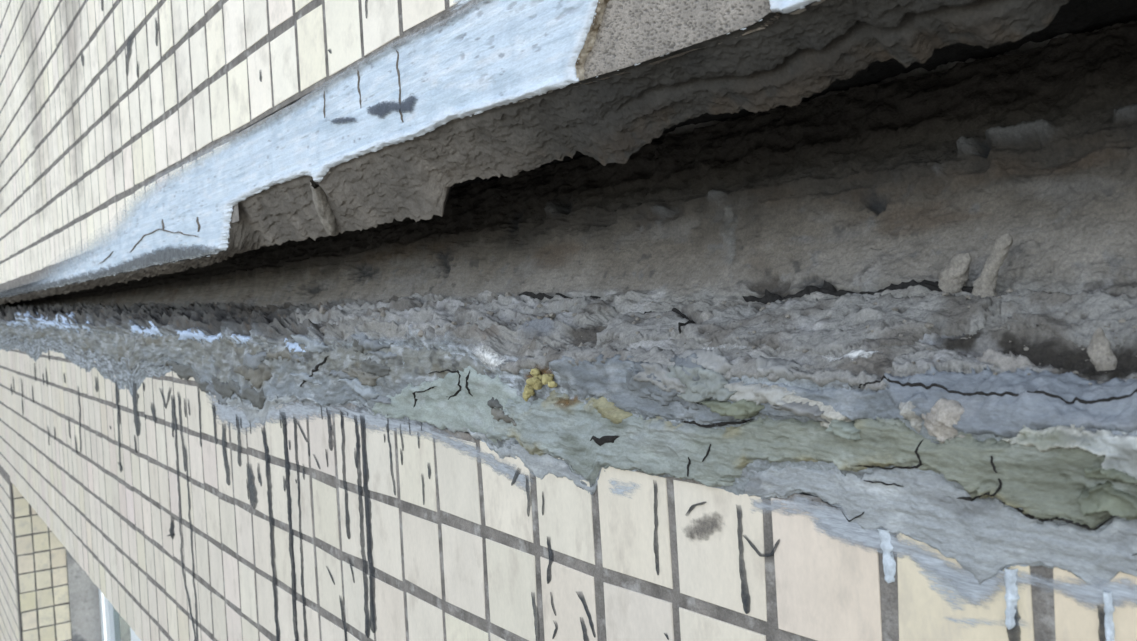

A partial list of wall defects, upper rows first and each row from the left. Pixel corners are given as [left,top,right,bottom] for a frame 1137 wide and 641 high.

spalling [572,0,781,87]
crack [98,217,201,264]
crack [858,375,1137,404]
damp [110,381,377,641]
damp [384,418,423,495]
crack [821,500,864,522]
crack [956,456,1118,530]
peeling [1002,424,1137,479]
damp [531,539,558,641]
damp [578,594,596,641]
damp [736,508,780,614]
damp [878,529,896,583]